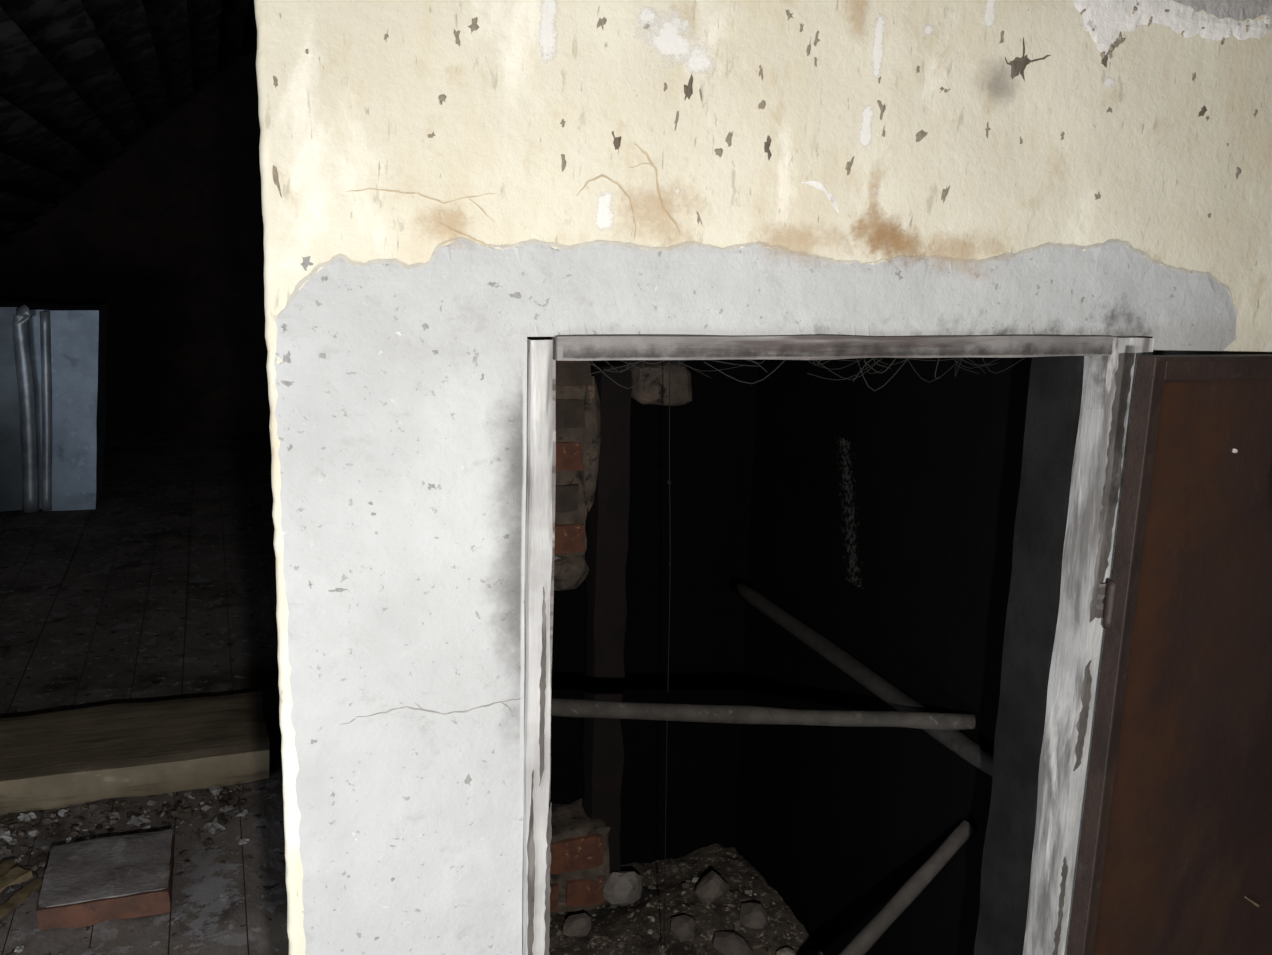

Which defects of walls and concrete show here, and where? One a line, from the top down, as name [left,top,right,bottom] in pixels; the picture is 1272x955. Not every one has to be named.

spalling [1073,0,1272,68]
crack [339,698,521,725]